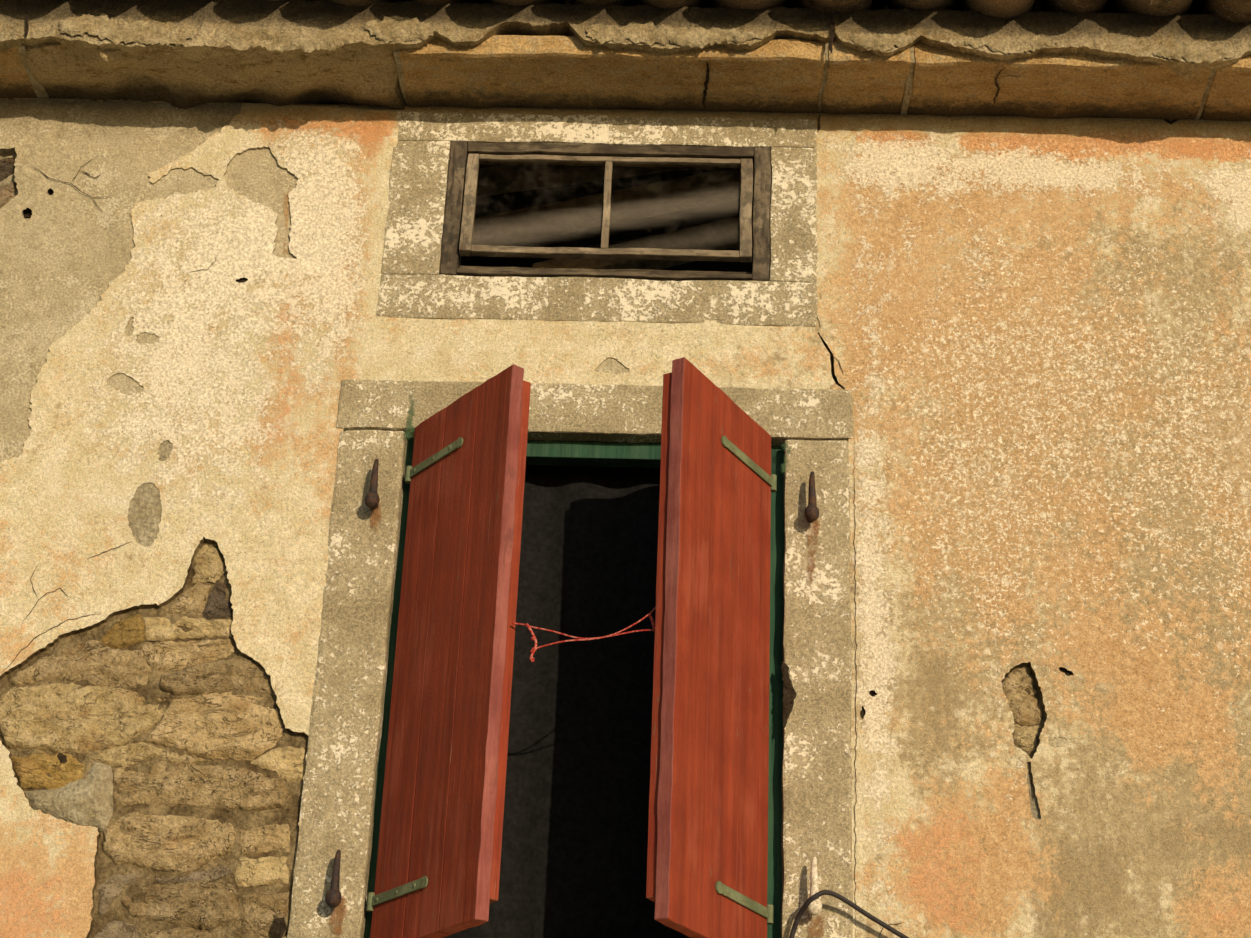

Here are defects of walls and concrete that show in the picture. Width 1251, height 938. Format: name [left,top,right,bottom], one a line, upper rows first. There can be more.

peeling [0,97,298,468]
crack [817,316,845,389]
flaking render [0,537,308,938]
spalling [1001,662,1067,819]